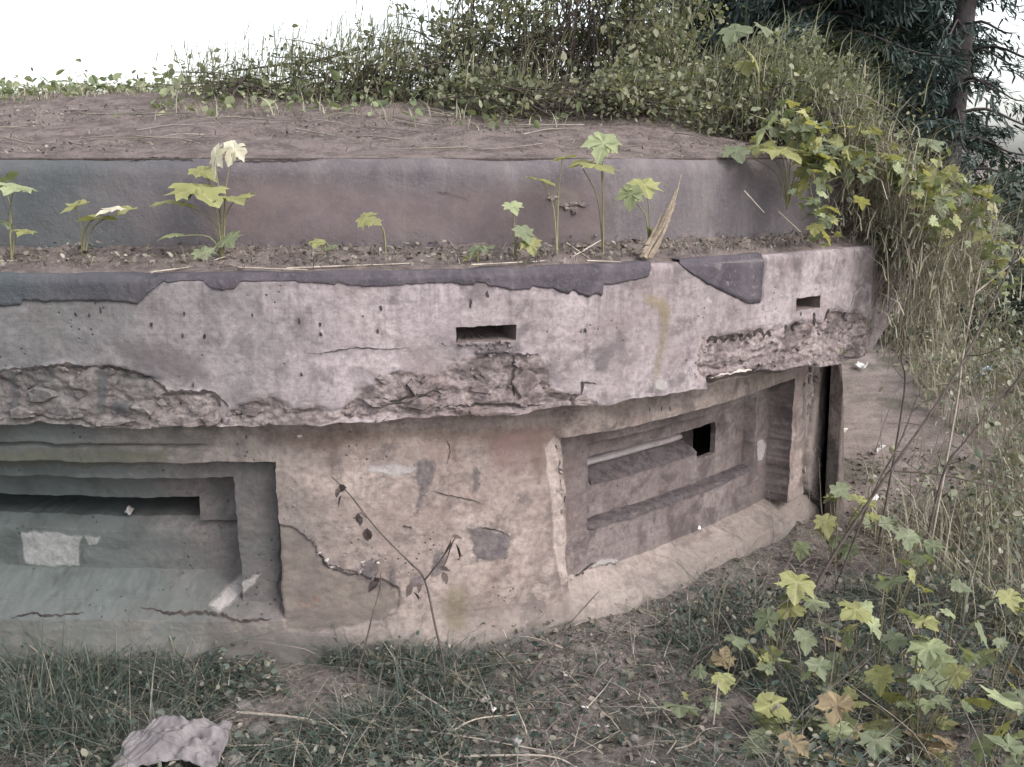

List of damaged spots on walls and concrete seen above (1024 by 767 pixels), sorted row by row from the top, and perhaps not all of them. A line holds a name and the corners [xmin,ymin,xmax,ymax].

spalling [0,333,605,429]
spalling [697,309,872,503]
crack [11,611,83,619]
crack [144,608,272,623]